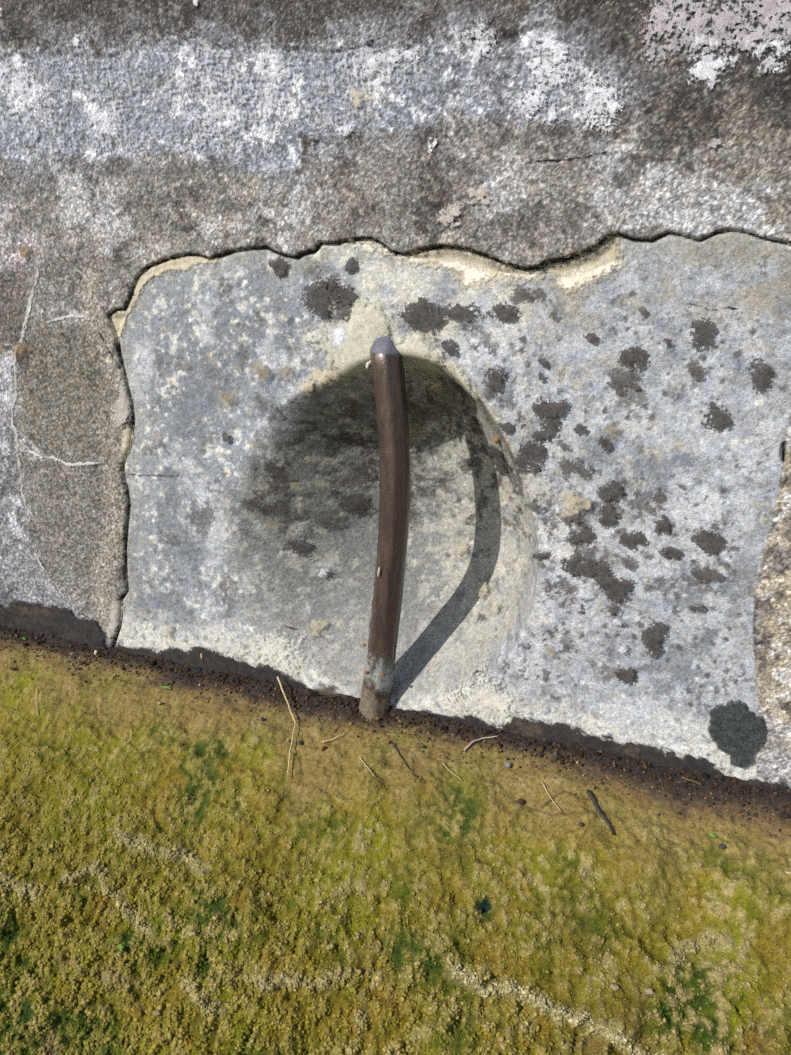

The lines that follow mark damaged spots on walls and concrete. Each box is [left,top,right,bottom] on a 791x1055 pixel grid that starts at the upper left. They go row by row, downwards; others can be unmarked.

crack [0,196,791,647]
leakage [391,658,723,778]
leakage [745,775,789,791]